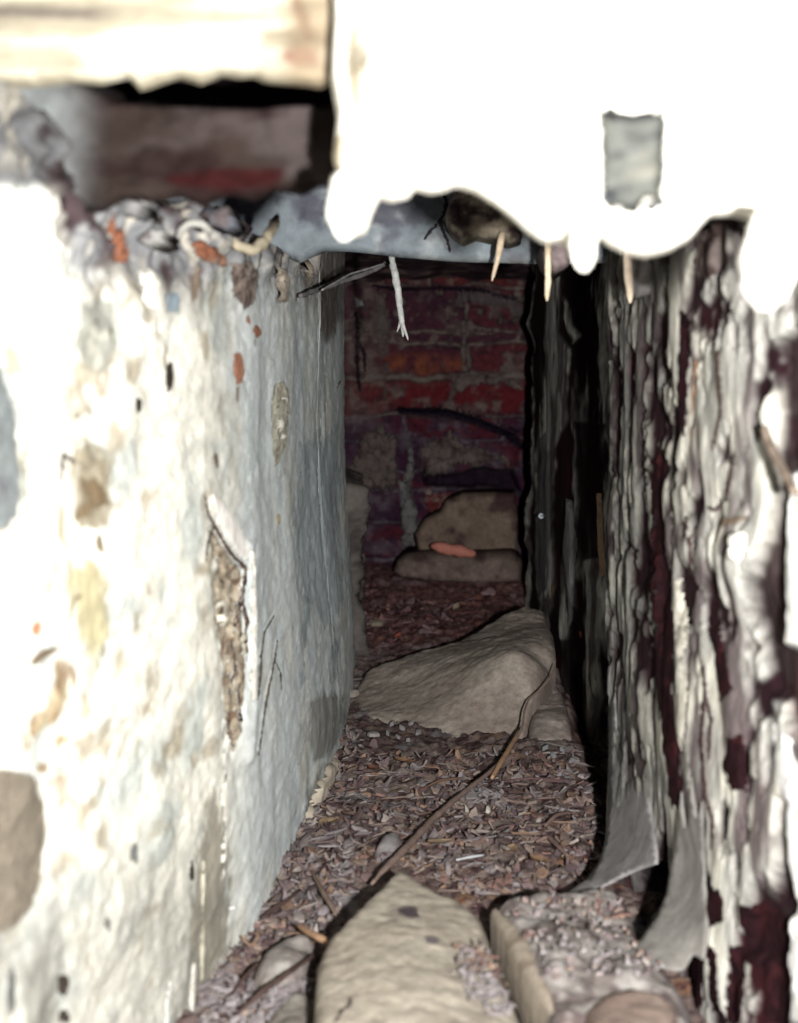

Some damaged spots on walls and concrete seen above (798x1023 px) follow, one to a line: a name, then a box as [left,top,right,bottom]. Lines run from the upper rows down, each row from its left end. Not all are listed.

flaking render [107,214,130,263]
peeling [130,269,161,350]
spalling [191,240,259,309]
spalling [693,216,749,283]
peeling [676,310,691,437]
spalling [271,381,290,466]
peeling [727,532,747,562]
spalling [208,494,258,752]
peeling [645,448,734,810]
peeling [722,734,757,793]
peeling [706,886,724,928]
peeling [691,901,791,1023]